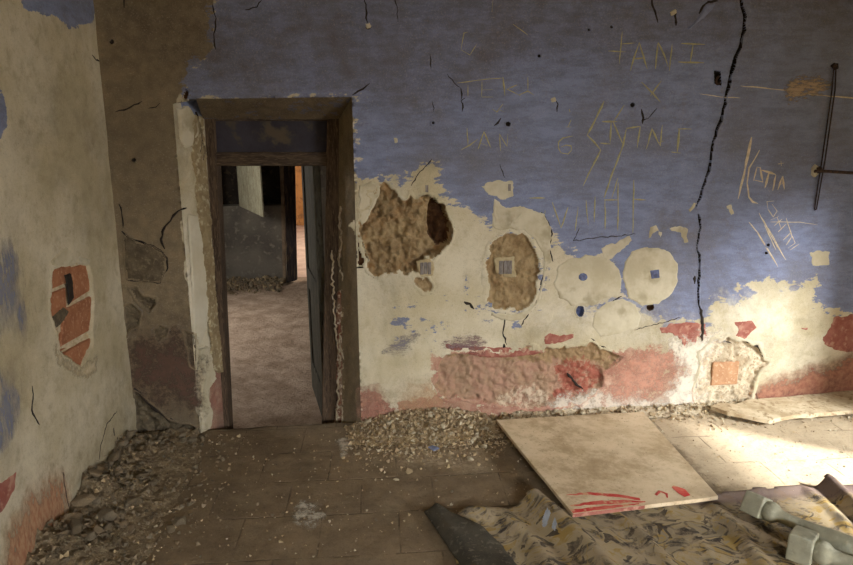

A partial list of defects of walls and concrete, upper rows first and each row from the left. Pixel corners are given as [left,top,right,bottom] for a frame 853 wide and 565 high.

crack [116,101,160,112]
crack [430,56,465,111]
crack [636,0,763,357]
flaking render [48,247,97,378]
crack [119,204,187,284]
flaking render [132,87,223,433]
flaking render [330,177,457,423]
flaking render [481,180,552,321]
crack [31,386,40,425]
flaking render [430,333,679,412]
flaking render [660,321,774,404]